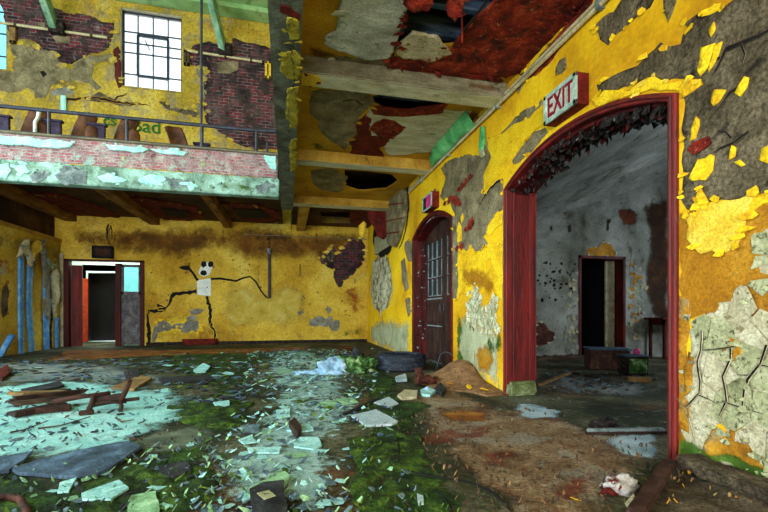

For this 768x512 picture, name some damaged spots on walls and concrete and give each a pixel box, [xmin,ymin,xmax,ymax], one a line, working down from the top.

peeling [0,136,75,149]
peeling [0,161,87,186]
flaking render [0,0,140,106]
peeling [103,142,188,156]
damp [78,227,358,259]
flaking render [157,4,378,172]
flaking render [307,235,426,348]
spalling [325,11,452,67]
spalling [440,99,548,337]
spalling [589,0,768,213]
crack [677,330,768,444]
peeling [678,229,768,478]